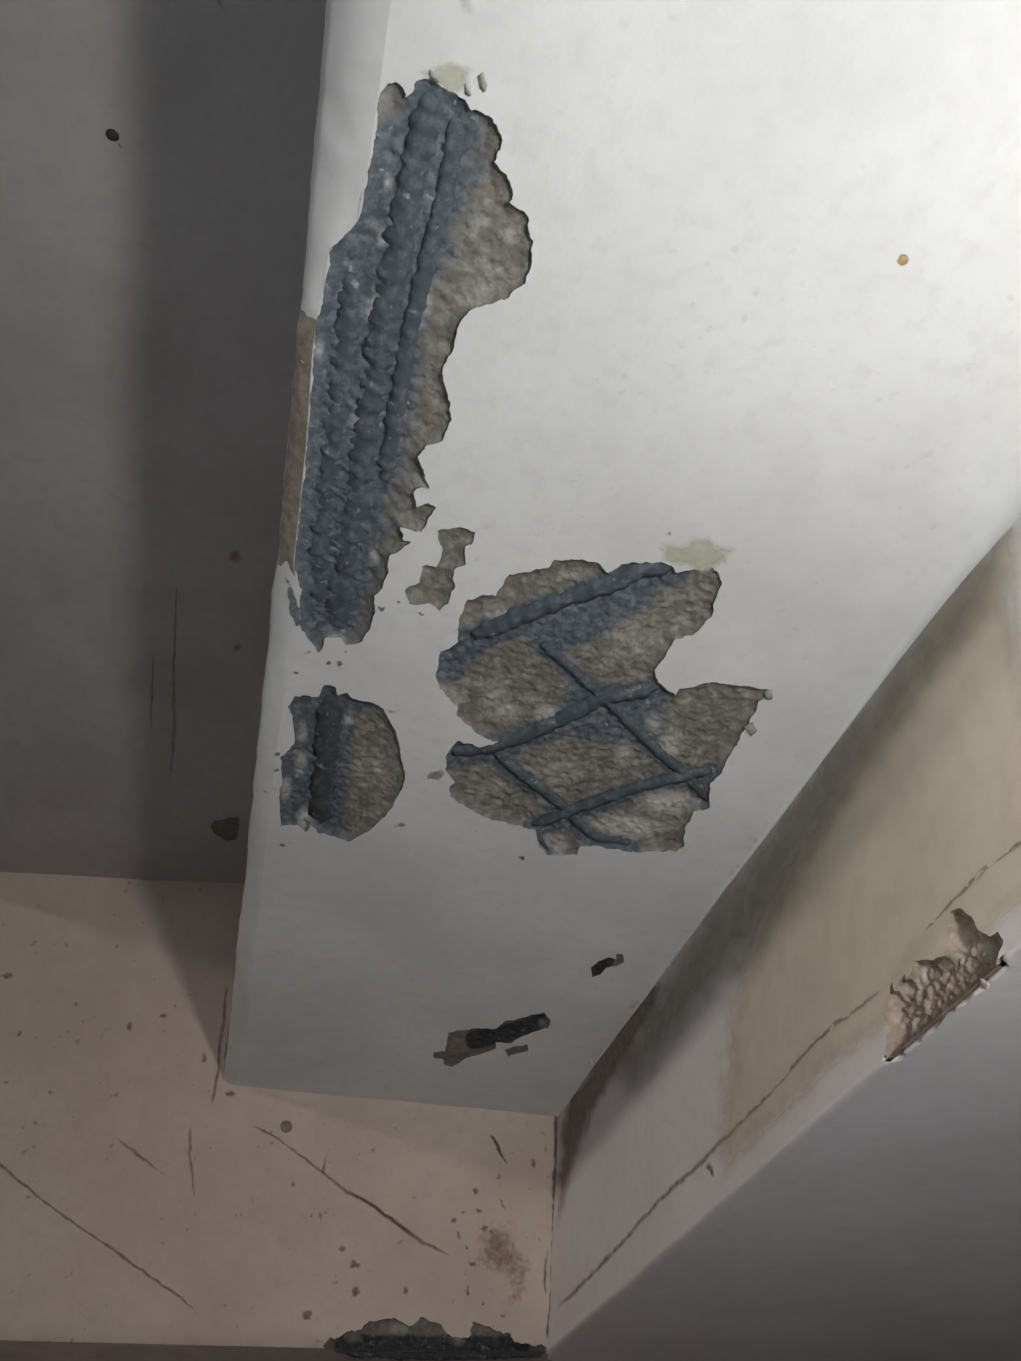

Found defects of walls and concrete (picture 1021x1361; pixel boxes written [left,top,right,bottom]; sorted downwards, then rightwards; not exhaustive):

spalling [264,65,772,855]
leakage [560,545,1021,1188]
peeling [433,1013,550,1067]
peeling [591,954,624,977]
spalling [886,908,1007,1062]
crack [0,1165,185,1302]
crack [262,1130,438,1250]
crack [544,999,869,1335]
spalling [324,1317,546,1361]